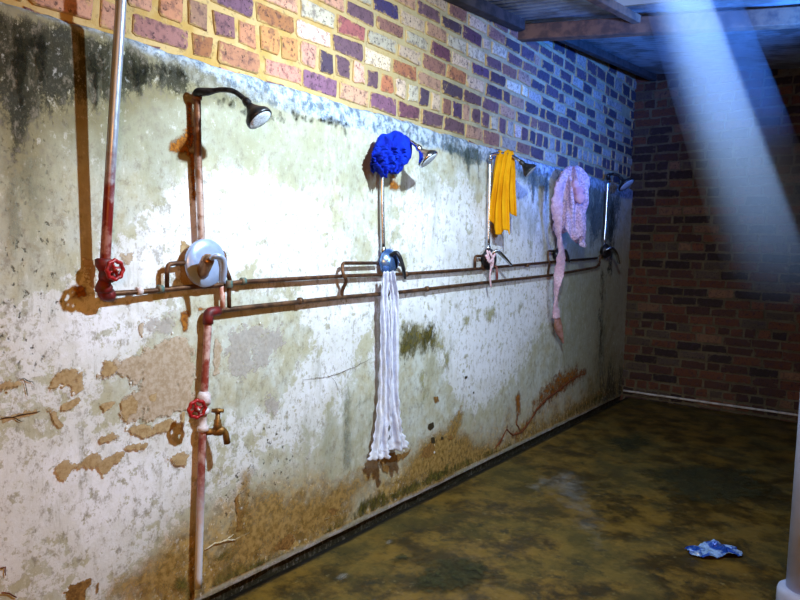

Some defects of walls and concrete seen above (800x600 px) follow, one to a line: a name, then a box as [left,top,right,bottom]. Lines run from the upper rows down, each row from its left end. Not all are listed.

damp [11,32,48,105]
damp [125,58,186,86]
corrosion [169,102,196,200]
corrosion [73,286,87,299]
corrosion [181,311,189,332]
peeling [47,367,86,428]
peeling [55,312,198,481]
corrosion [513,368,586,439]
damp [409,410,492,485]
damp [214,472,374,576]
damp [360,492,385,510]
spalling [64,578,99,600]